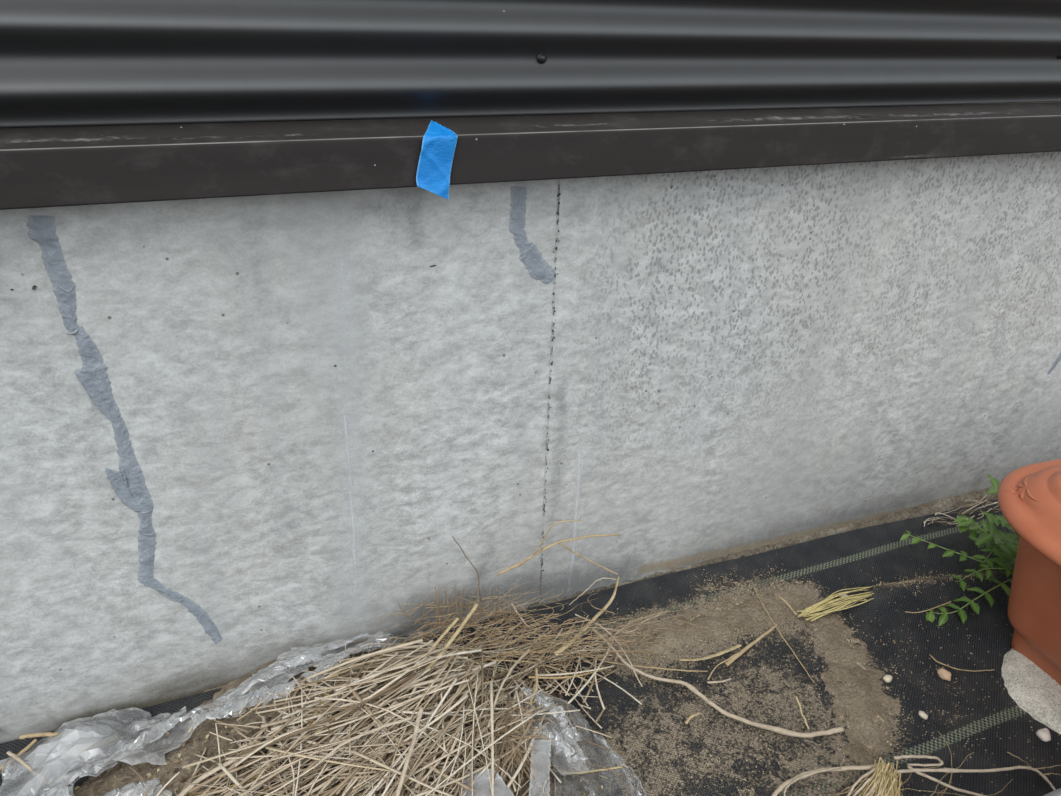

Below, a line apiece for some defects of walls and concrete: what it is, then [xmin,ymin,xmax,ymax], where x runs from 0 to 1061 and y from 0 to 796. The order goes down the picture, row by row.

crack [26,215,223,644]
crack [509,184,561,600]
crack [1047,352,1061,374]